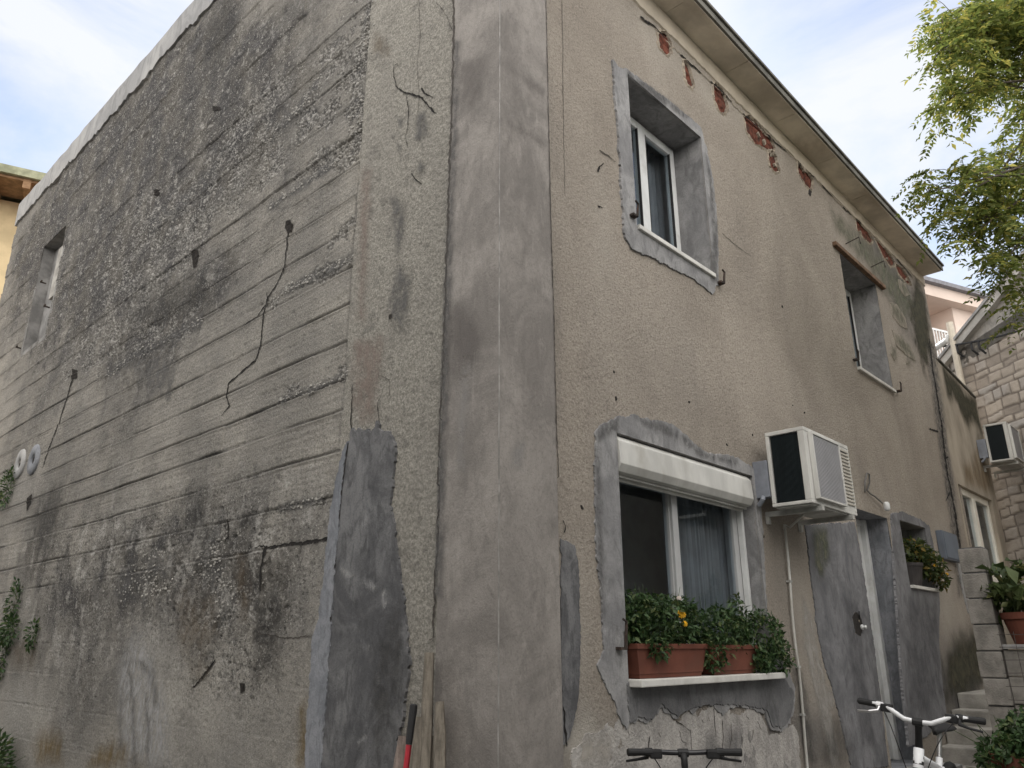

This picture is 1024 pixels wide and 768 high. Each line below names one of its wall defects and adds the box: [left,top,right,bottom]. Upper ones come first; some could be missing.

flaking render [656,28,695,91]
flaking render [711,80,729,117]
flaking render [743,113,780,175]
flaking render [796,160,814,196]
flaking render [855,218,912,286]
crack [222,220,293,415]
crack [393,0,455,641]
crack [43,369,78,465]
crack [255,537,327,592]
flaking render [570,706,801,768]